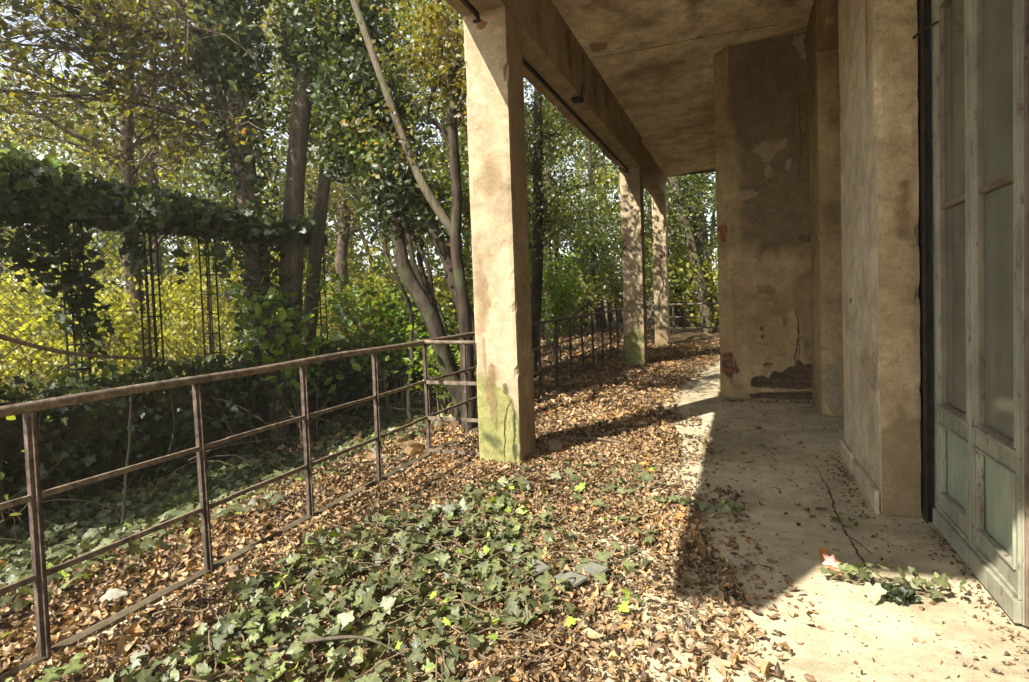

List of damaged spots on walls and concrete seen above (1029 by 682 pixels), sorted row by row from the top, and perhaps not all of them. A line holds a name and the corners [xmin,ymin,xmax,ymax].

crack [793,312,801,365]
spalling [722,352,739,382]
spalling [750,361,813,400]
crack [811,460,880,575]